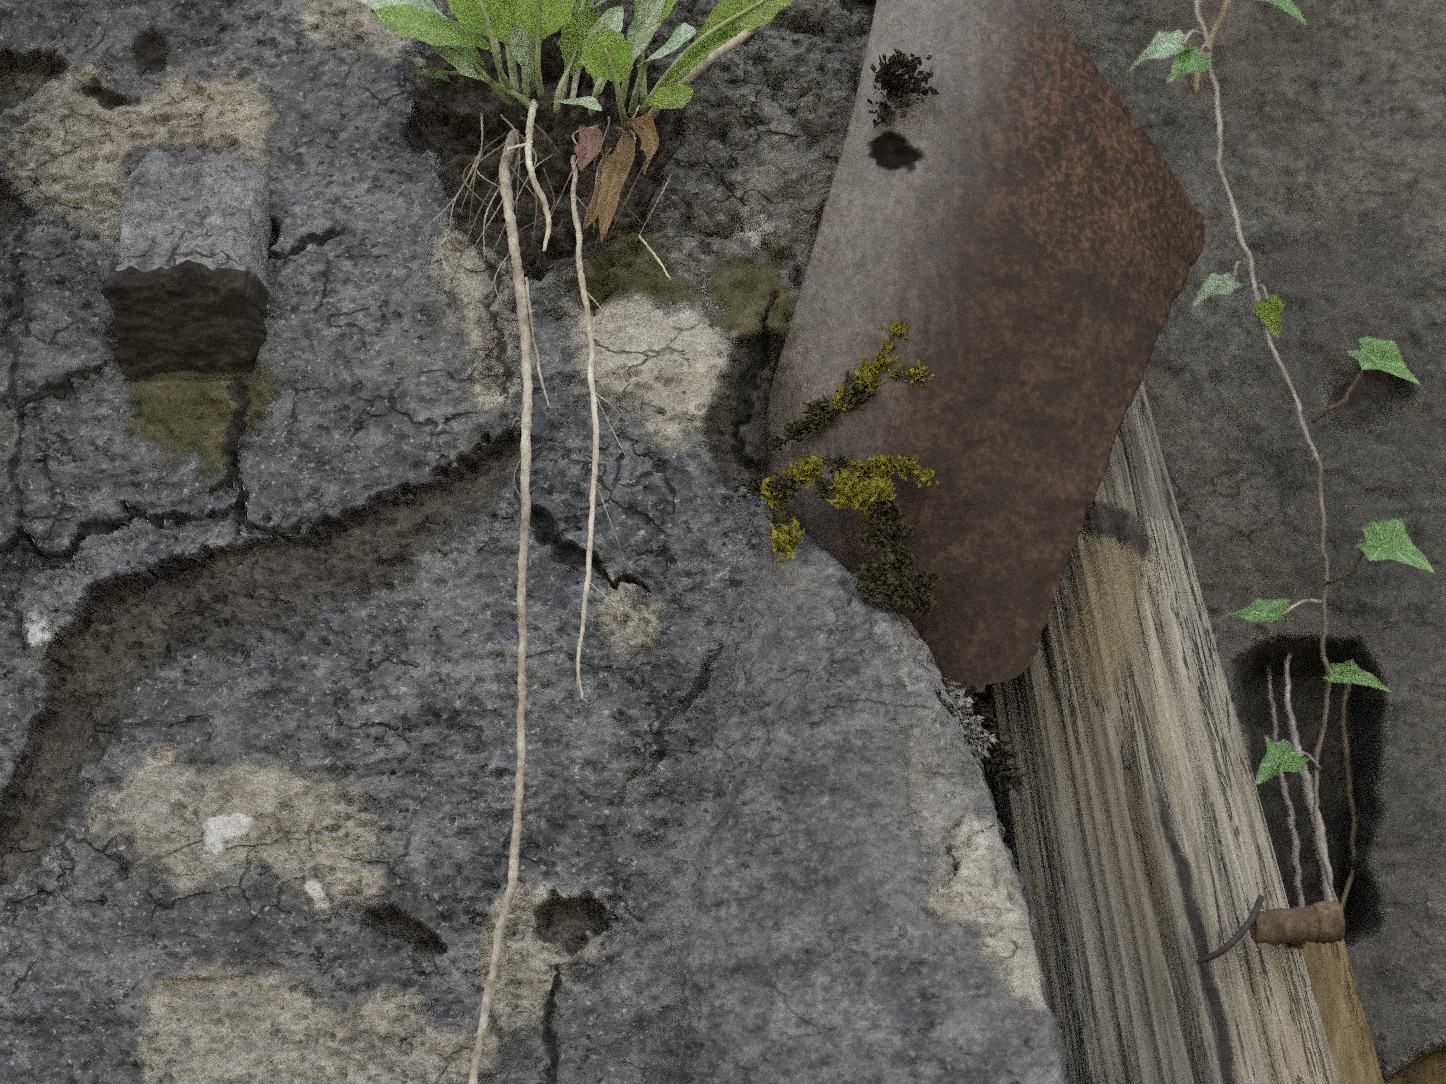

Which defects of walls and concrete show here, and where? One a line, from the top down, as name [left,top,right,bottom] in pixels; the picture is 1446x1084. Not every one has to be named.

leakage [130,364,272,474]
spalling [0,216,534,955]
spalling [1234,637,1384,944]